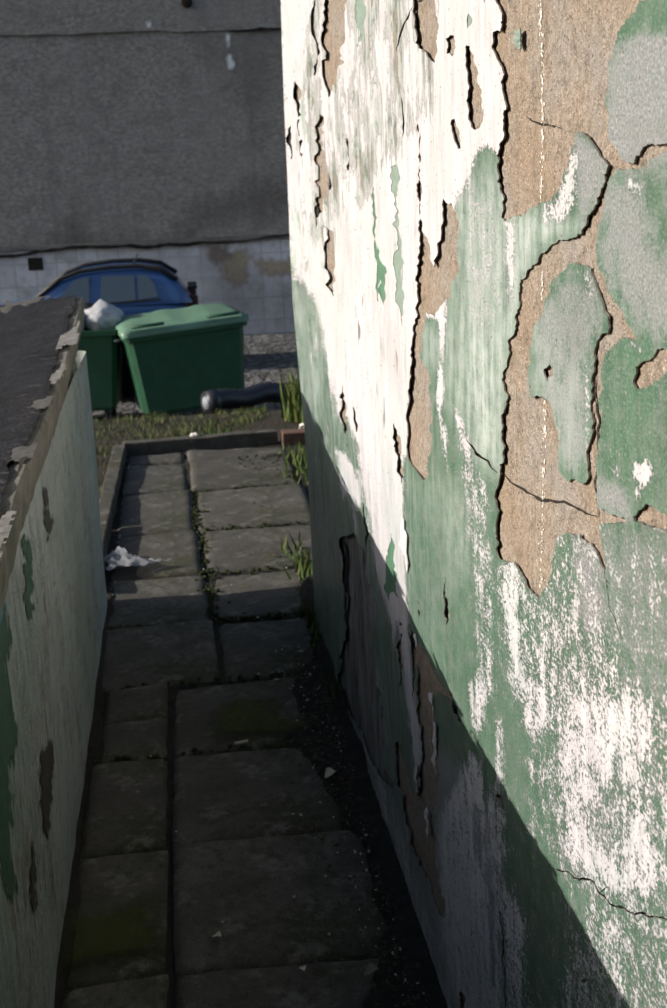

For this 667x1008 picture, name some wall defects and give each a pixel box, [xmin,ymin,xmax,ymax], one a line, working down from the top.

peeling [294,82,302,116]
peeling [315,115,336,296]
flaking render [322,0,367,97]
peeling [372,164,405,321]
flaking render [394,201,459,480]
flaking render [414,0,484,130]
peeling [452,119,461,149]
flaking render [493,0,667,597]
crack [478,373,600,517]
peeling [0,601,55,915]
flaking render [339,516,461,916]
crack [559,869,667,920]